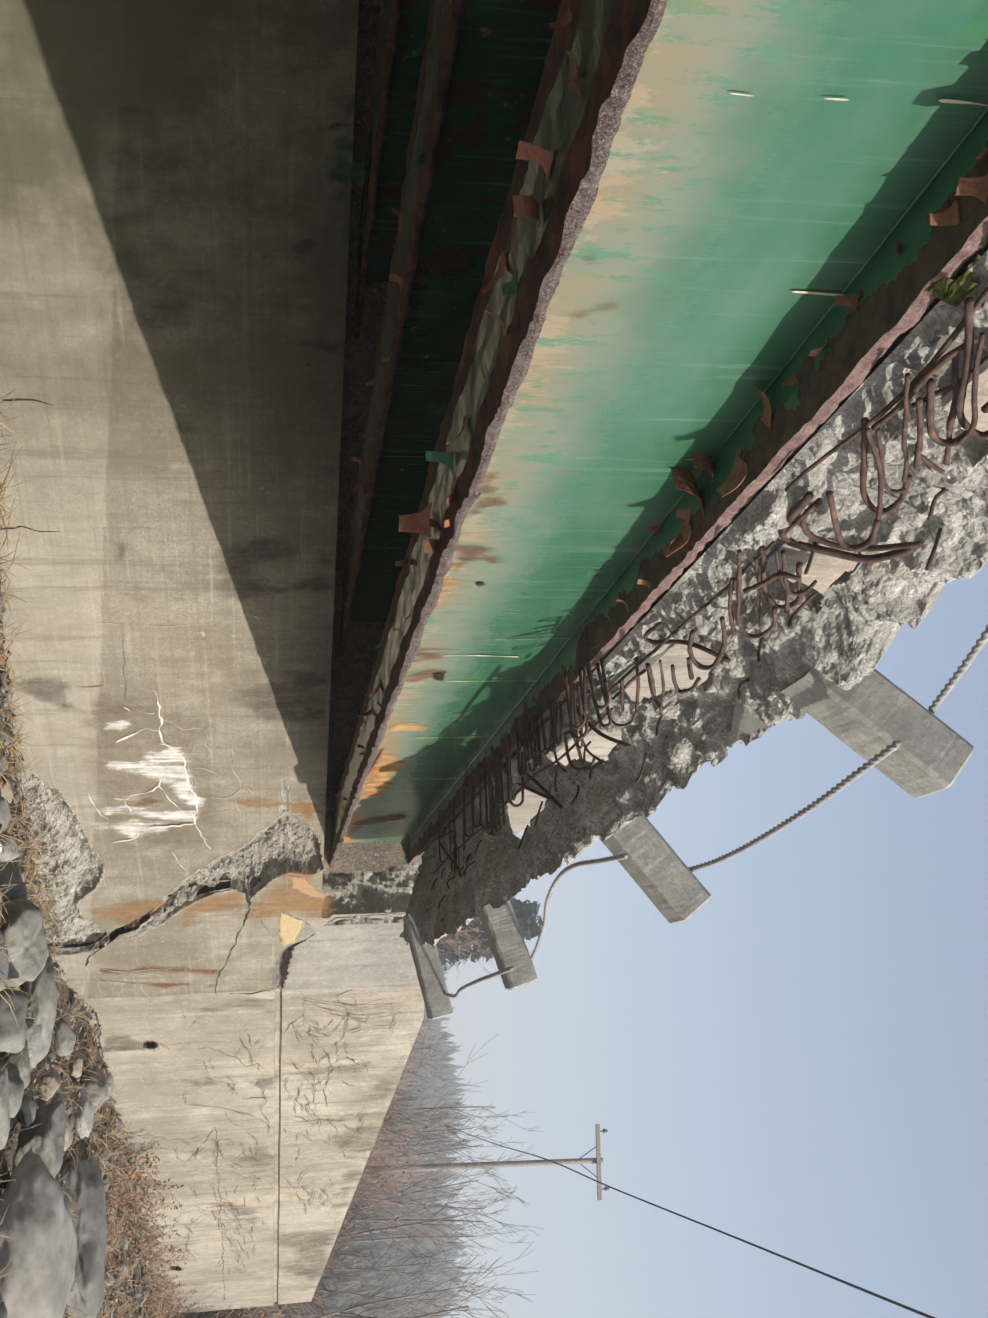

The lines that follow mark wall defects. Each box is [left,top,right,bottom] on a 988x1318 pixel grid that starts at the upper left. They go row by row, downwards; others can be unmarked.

peeling [516,140,555,181]
peeling [926,146,988,226]
spalling [399,250,988,948]
leakage [107,721,131,729]
leakage [102,747,204,838]
crack [51,622,300,997]
spalling [18,768,329,954]
corrosion [137,967,217,988]
crack [162,990,398,1300]